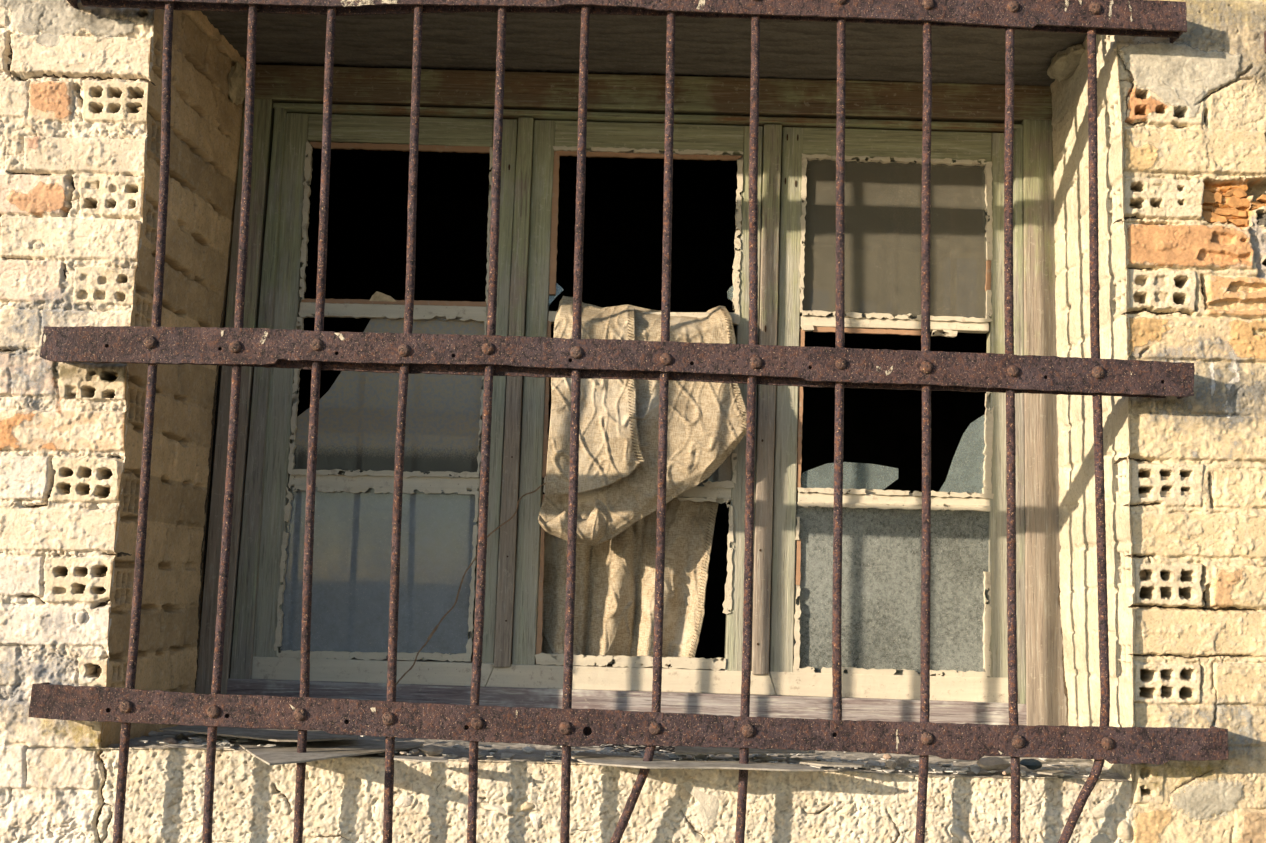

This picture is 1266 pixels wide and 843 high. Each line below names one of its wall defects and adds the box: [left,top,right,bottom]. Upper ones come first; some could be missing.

peeling [7,181,68,217]
peeling [1126,176,1266,359]
peeling [1237,813,1266,843]